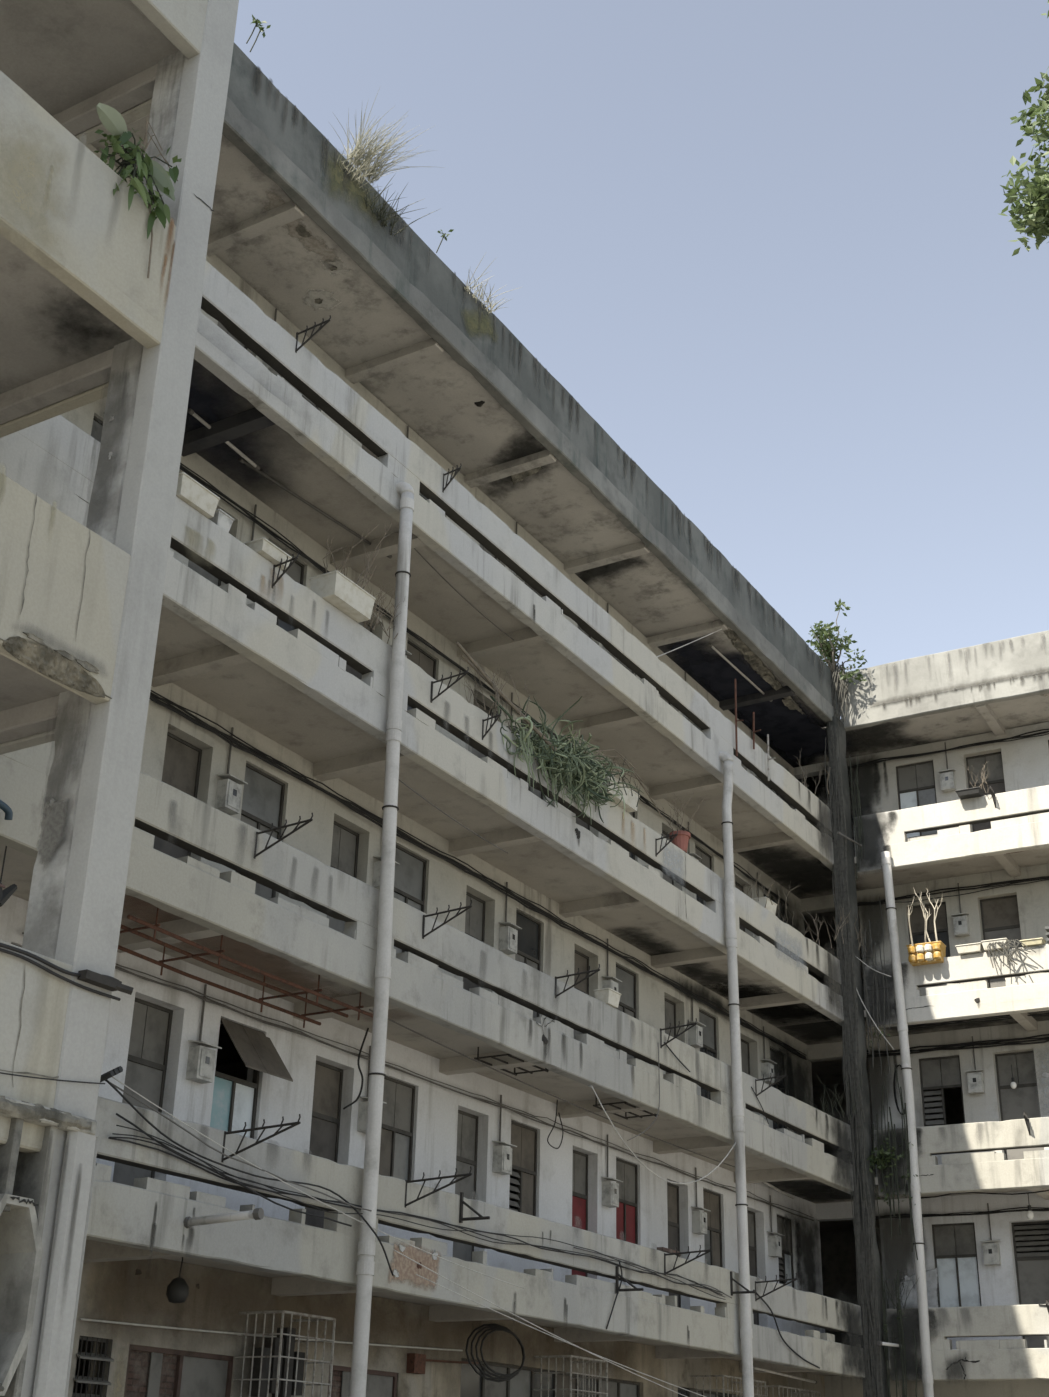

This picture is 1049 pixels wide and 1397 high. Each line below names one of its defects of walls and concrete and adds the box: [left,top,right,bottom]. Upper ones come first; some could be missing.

crack [20,494,37,614]
spalling [0,632,112,699]
water stain [618,653,853,1202]
water stain [846,668,1049,1034]
water stain [866,1053,936,1380]
water stain [785,1217,865,1375]
water stain [947,1359,965,1379]